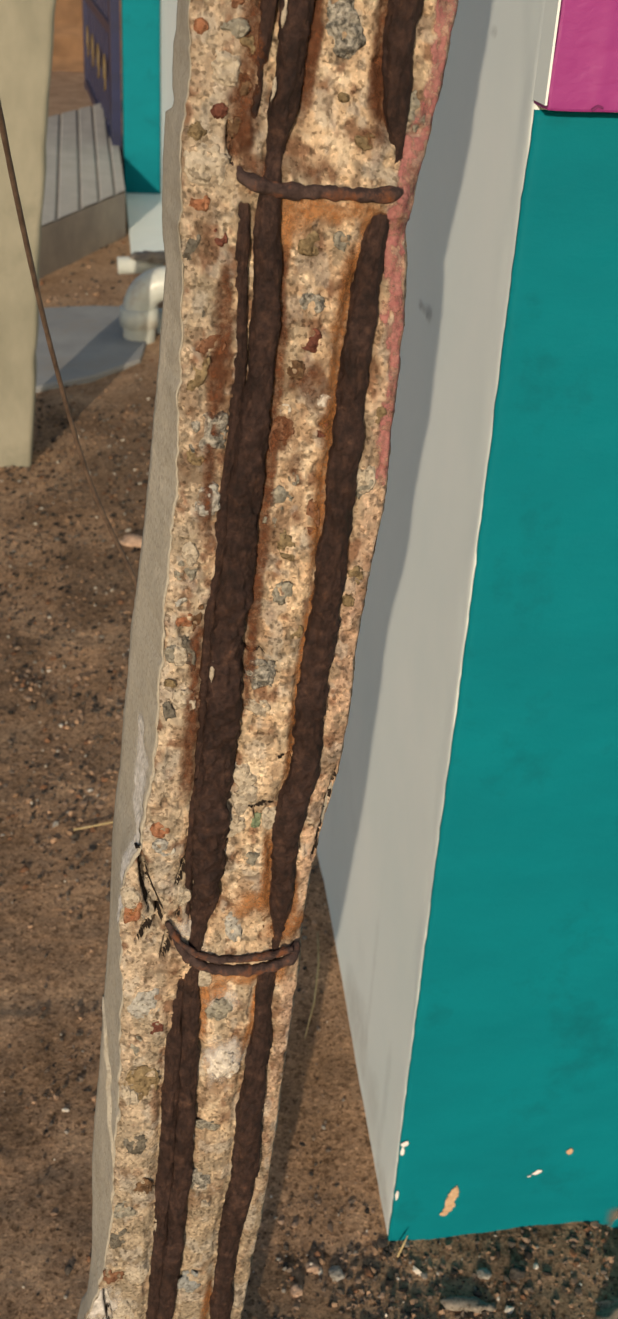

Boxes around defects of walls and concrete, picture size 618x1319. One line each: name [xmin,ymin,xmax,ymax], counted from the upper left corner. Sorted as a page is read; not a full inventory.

rust [228,0,266,176]
rust [299,0,323,112]
rust [367,0,388,136]
rust [199,269,233,529]
rust [244,198,373,699]
rust [181,626,203,795]
spalling [84,0,459,1319]
rust [284,595,313,779]
crack [134,842,186,956]
rust [237,835,304,938]
rust [199,974,257,1043]